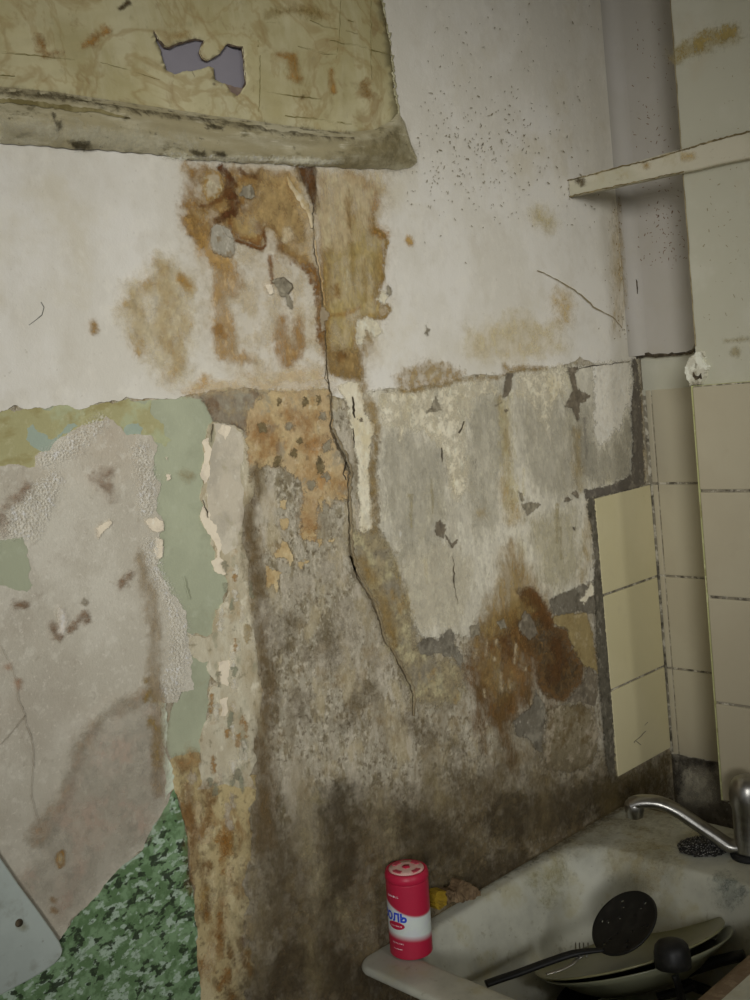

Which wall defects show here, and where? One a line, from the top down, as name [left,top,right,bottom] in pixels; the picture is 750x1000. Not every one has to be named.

peeling [164,153,345,165]
water stain [407,77,569,216]
water stain [123,260,195,377]
water stain [183,151,391,392]
crack [312,198,417,716]
water stain [366,402,380,432]
water stain [398,362,462,392]
crack [537,270,622,328]
crack [567,174,696,372]
flaking render [0,358,646,1000]
water stain [245,500,713,1000]